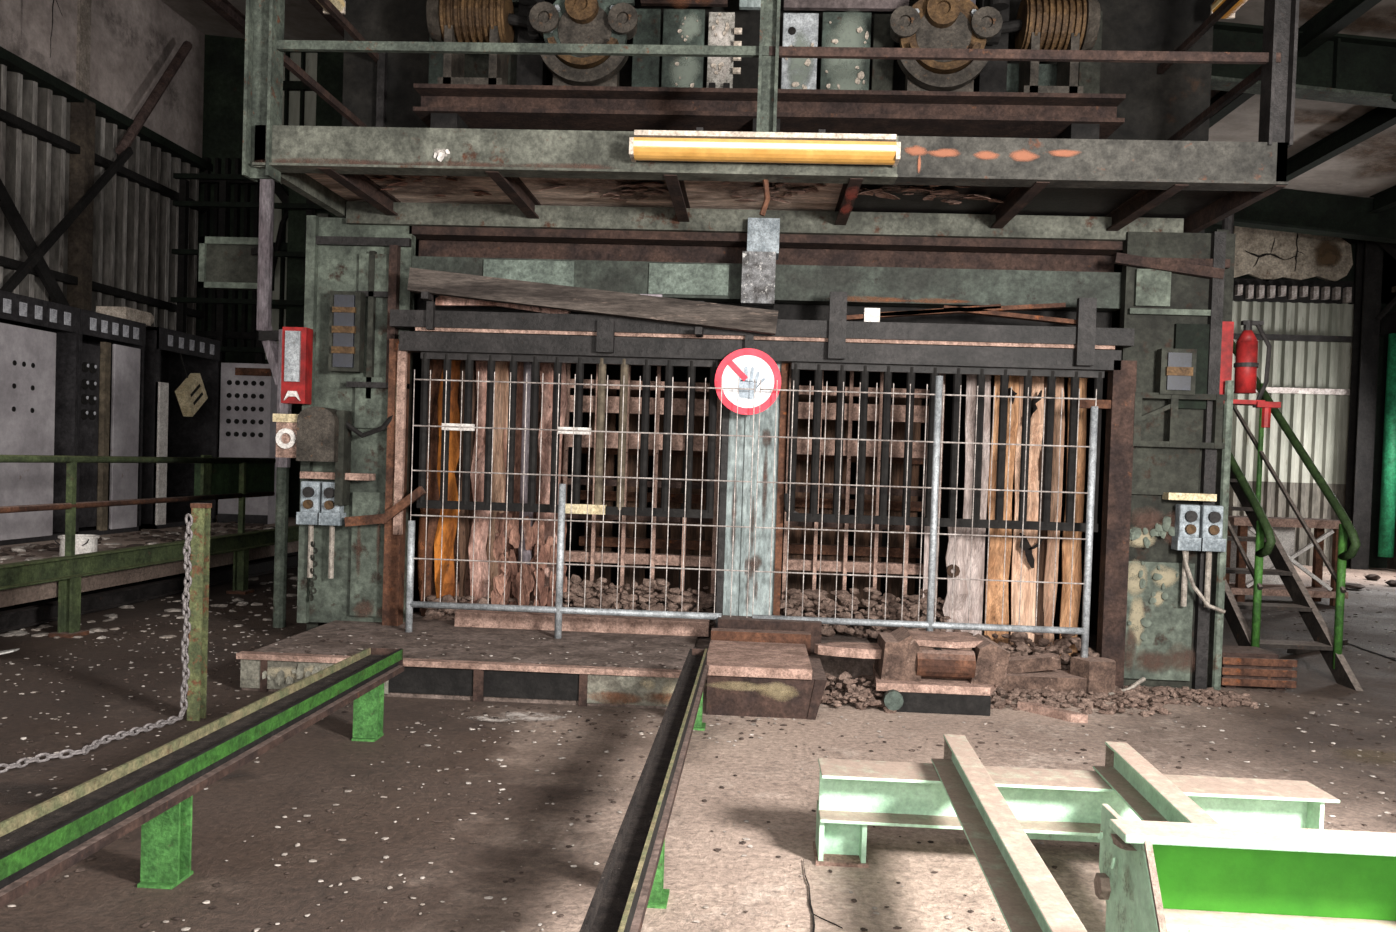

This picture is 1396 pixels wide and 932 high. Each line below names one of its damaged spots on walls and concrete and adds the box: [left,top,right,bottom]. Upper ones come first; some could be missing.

corrosion [907,146,958,172]
corrosion [975,150,1078,161]
peeling [1127,516,1178,642]
crack [803,859,843,932]